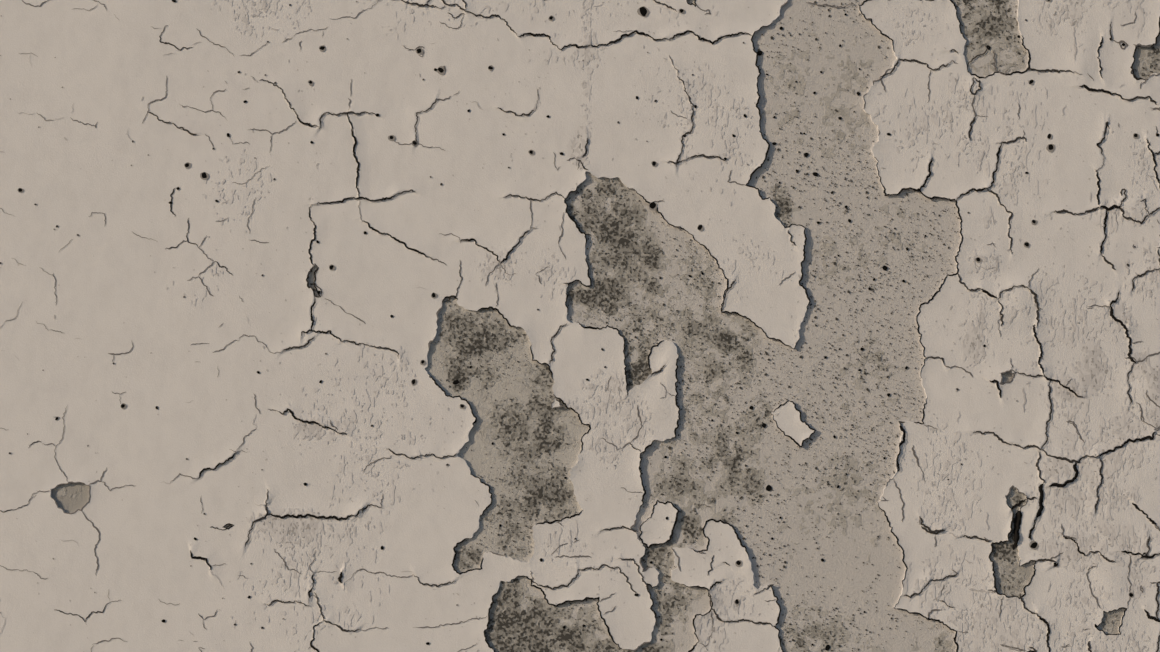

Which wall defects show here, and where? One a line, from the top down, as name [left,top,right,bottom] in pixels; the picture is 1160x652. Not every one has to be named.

spalling [950,0,1031,79]
spalling [1130,17,1160,80]
spalling [484,0,963,652]
crack [0,410,133,512]
spalling [50,482,91,514]
crack [57,512,127,652]
crack [160,394,487,652]
spalling [425,295,591,575]
crack [530,522,650,613]
crack [601,365,675,452]
crack [671,547,777,651]
spalling [989,485,1036,599]